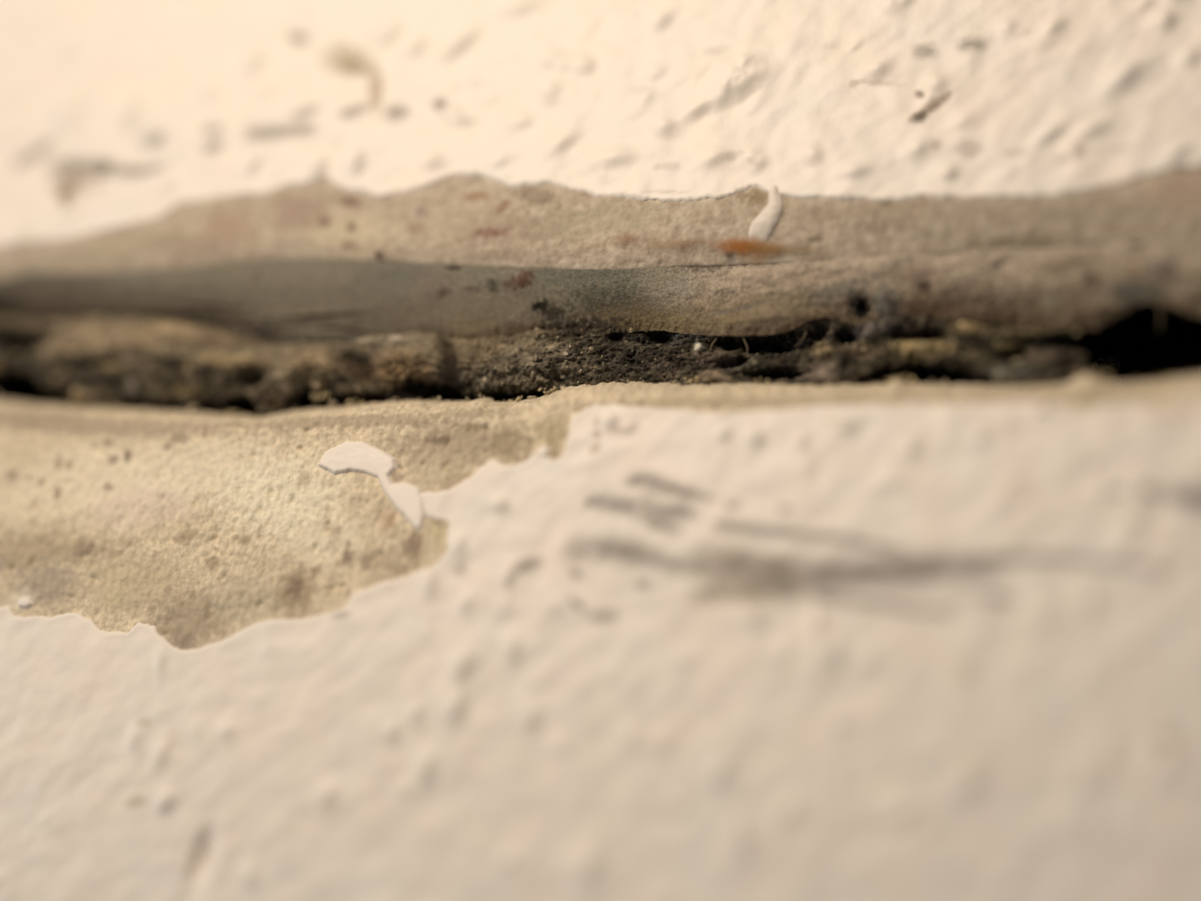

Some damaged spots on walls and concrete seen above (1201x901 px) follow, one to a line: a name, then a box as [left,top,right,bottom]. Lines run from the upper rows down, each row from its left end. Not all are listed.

flaking render [0,166,1201,280]
crack [0,241,1201,417]
rust [724,242,768,257]
flaking render [0,373,1201,650]